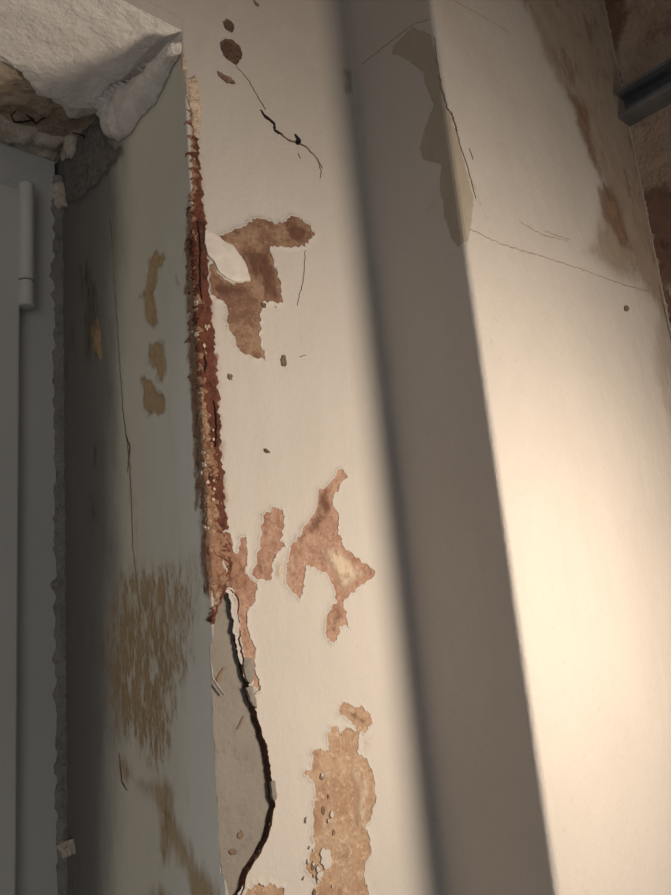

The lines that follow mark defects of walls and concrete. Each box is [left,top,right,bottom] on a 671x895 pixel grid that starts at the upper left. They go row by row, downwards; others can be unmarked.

flaking render [0,40,182,202]
crack [236,66,322,178]
peeling [393,28,473,246]
leakage [527,0,671,323]
corrosion [180,54,246,625]
peeling [204,211,318,367]
peeling [209,464,380,895]